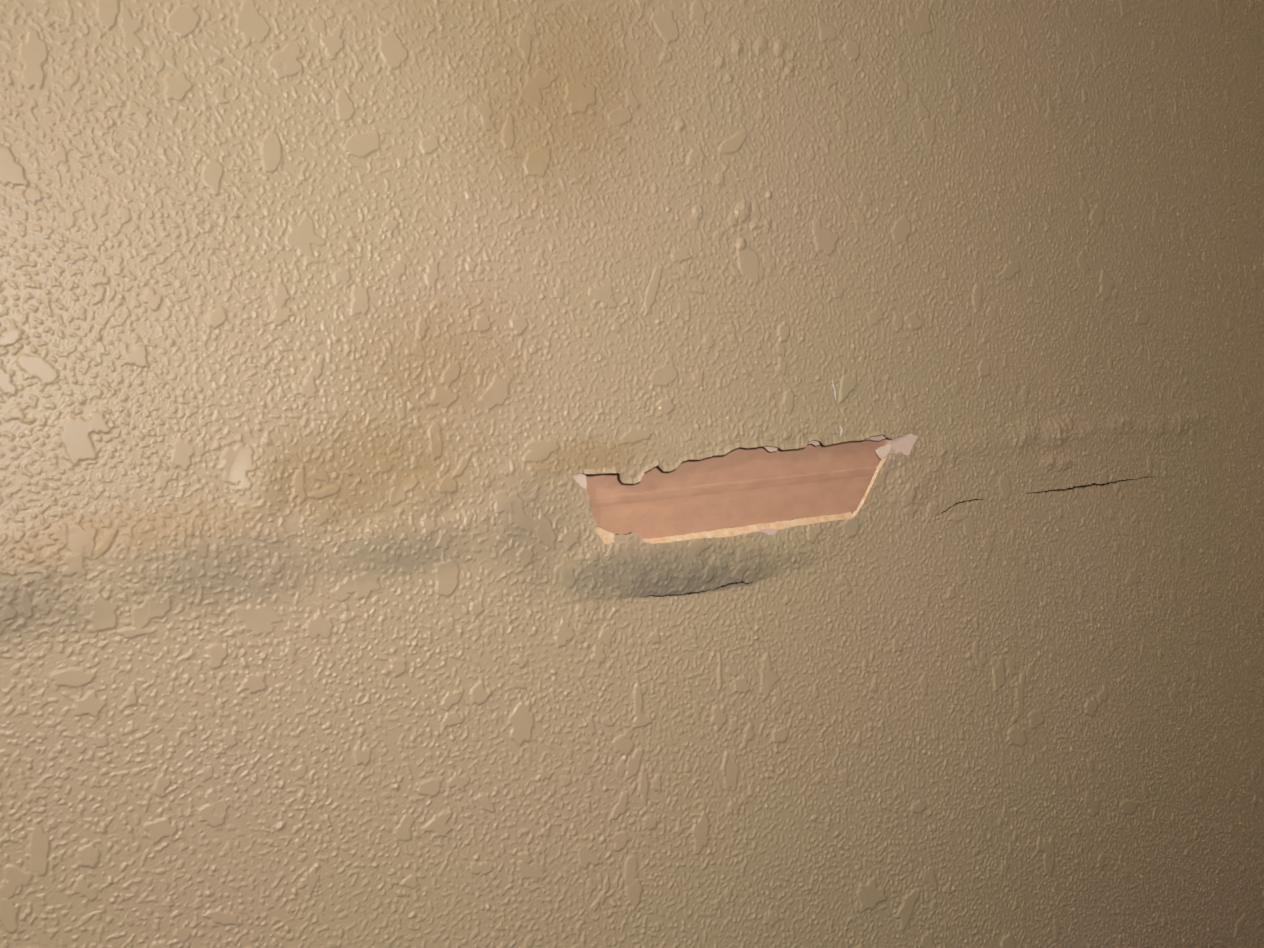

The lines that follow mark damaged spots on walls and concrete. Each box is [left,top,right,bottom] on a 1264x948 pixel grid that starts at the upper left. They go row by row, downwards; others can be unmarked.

spalling [573,429,918,545]
crack [1027,476,1154,494]